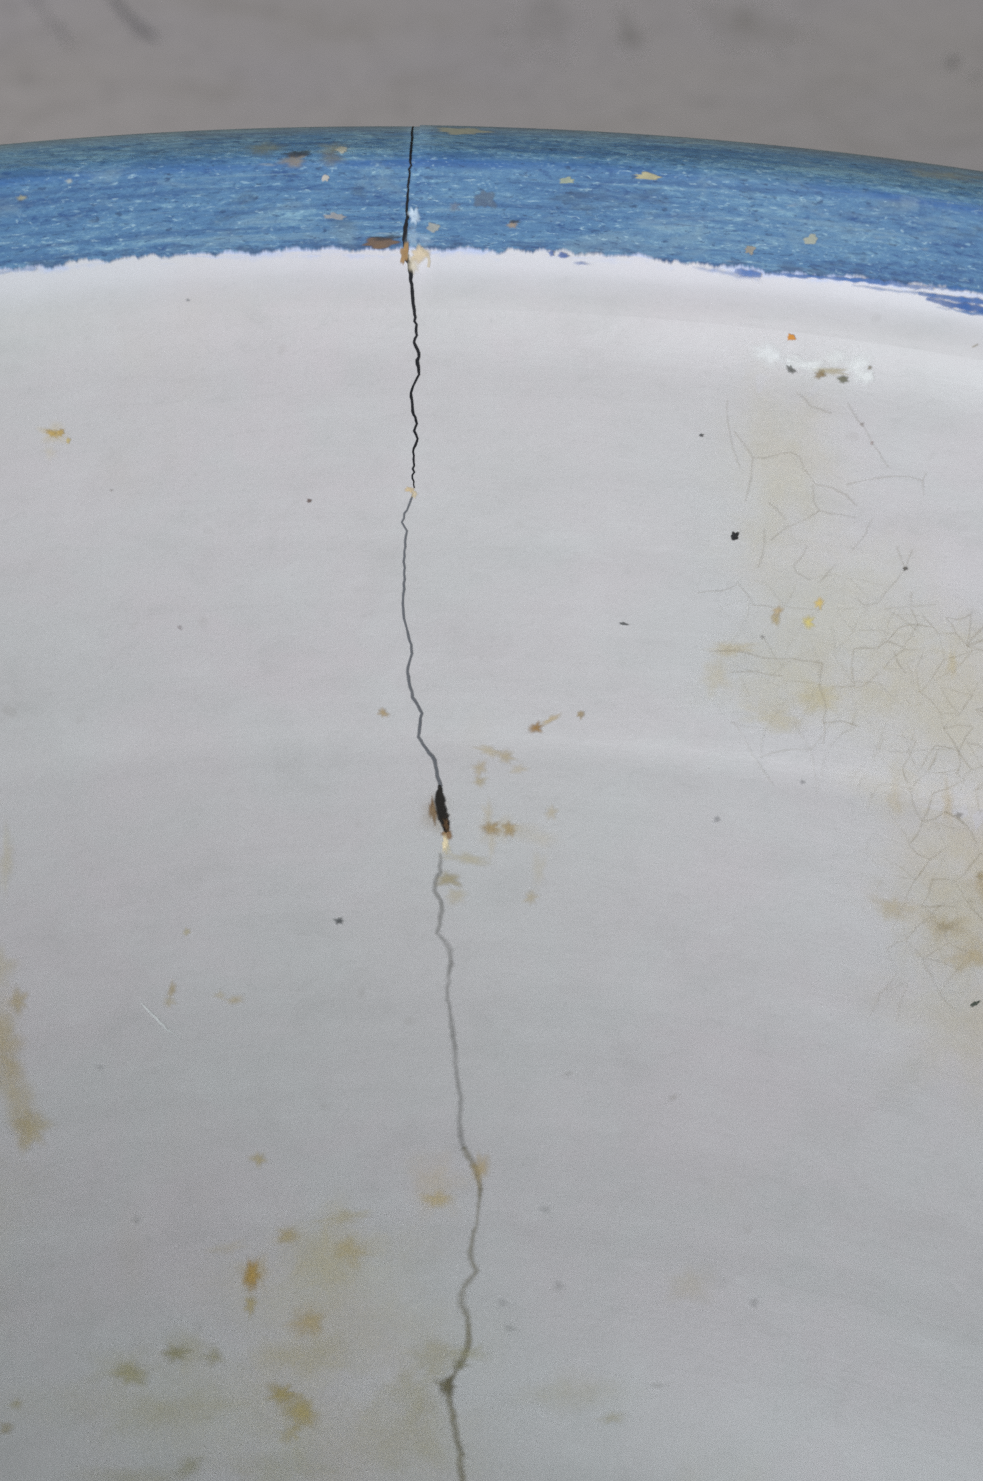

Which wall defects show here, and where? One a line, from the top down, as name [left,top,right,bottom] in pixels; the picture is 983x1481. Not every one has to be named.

crack [401,126,450,833]